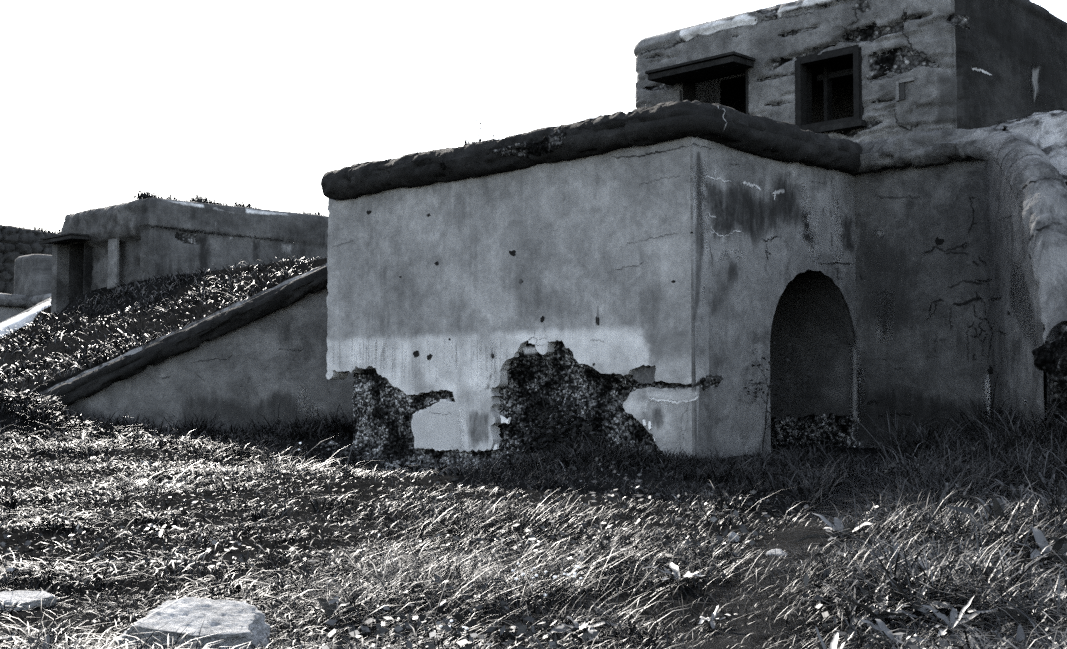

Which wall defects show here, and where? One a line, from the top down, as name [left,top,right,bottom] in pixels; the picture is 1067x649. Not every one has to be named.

leakage [697,154,853,272]
crack [924,108,1067,360]
spalling [350,342,720,469]